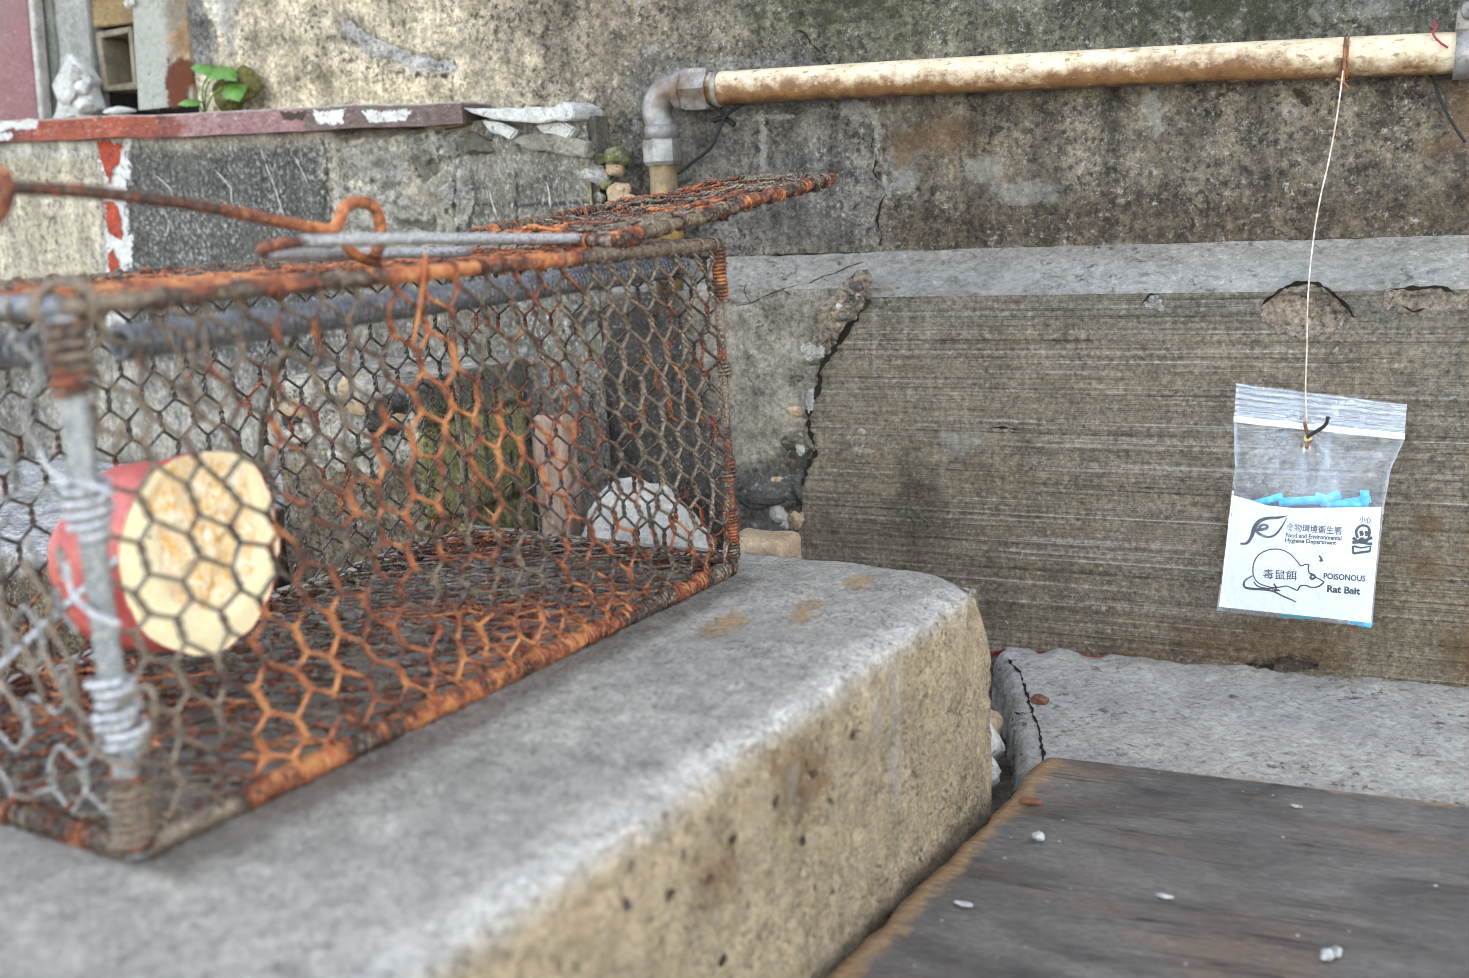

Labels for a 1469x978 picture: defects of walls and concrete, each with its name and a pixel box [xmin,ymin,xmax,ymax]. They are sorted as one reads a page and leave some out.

peeling [0,118,39,141]
spalling [1260,281,1354,340]
spalling [1382,284,1469,318]
spalling [769,270,873,532]
crack [1008,659,1046,761]